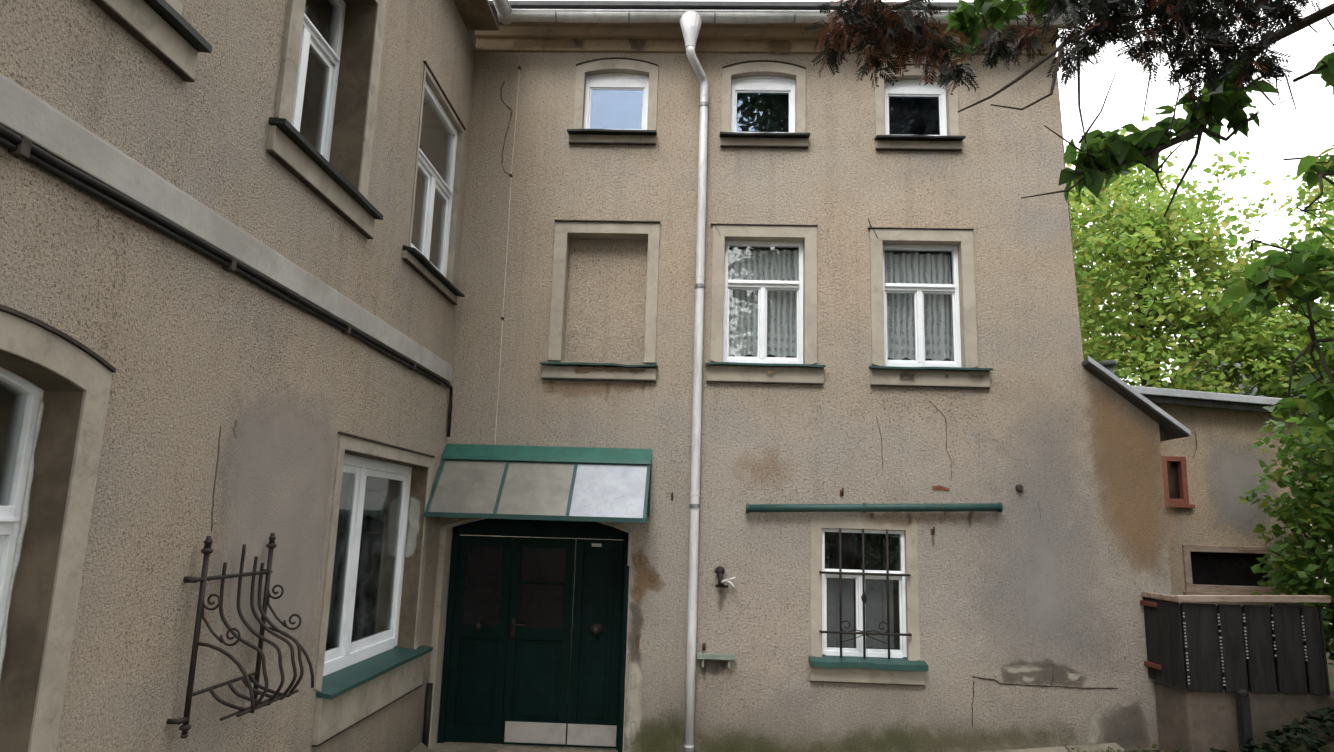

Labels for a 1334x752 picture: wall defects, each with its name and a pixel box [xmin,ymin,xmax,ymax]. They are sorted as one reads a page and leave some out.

crack [929,401,952,479]
peeling [632,551,662,603]
water stain [629,605,642,660]
peeling [1003,661,1081,685]